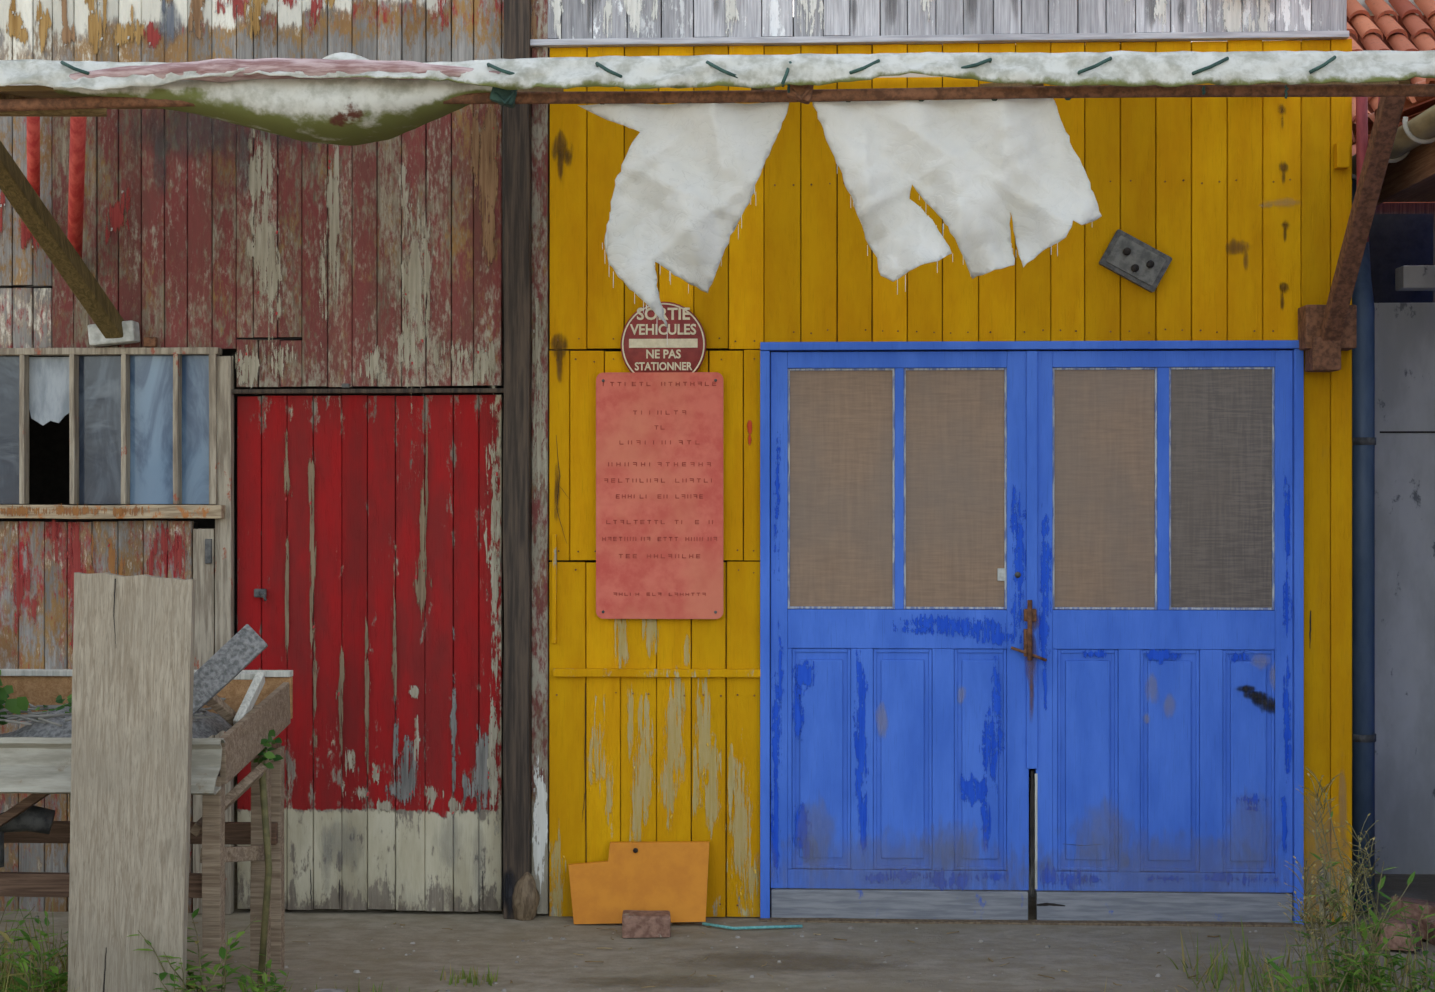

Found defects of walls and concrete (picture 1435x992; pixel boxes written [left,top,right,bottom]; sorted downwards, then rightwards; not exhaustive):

peeling [6,0,161,54]
peeling [188,0,335,40]
peeling [232,129,296,387]
peeling [319,145,343,327]
peeling [470,104,499,271]
peeling [47,519,125,652]
peeling [308,460,317,755]
peeling [336,161,501,835]
peeling [588,619,814,903]
peeling [853,650,869,854]
peeling [893,485,1052,850]
rust [1029,620,1037,709]